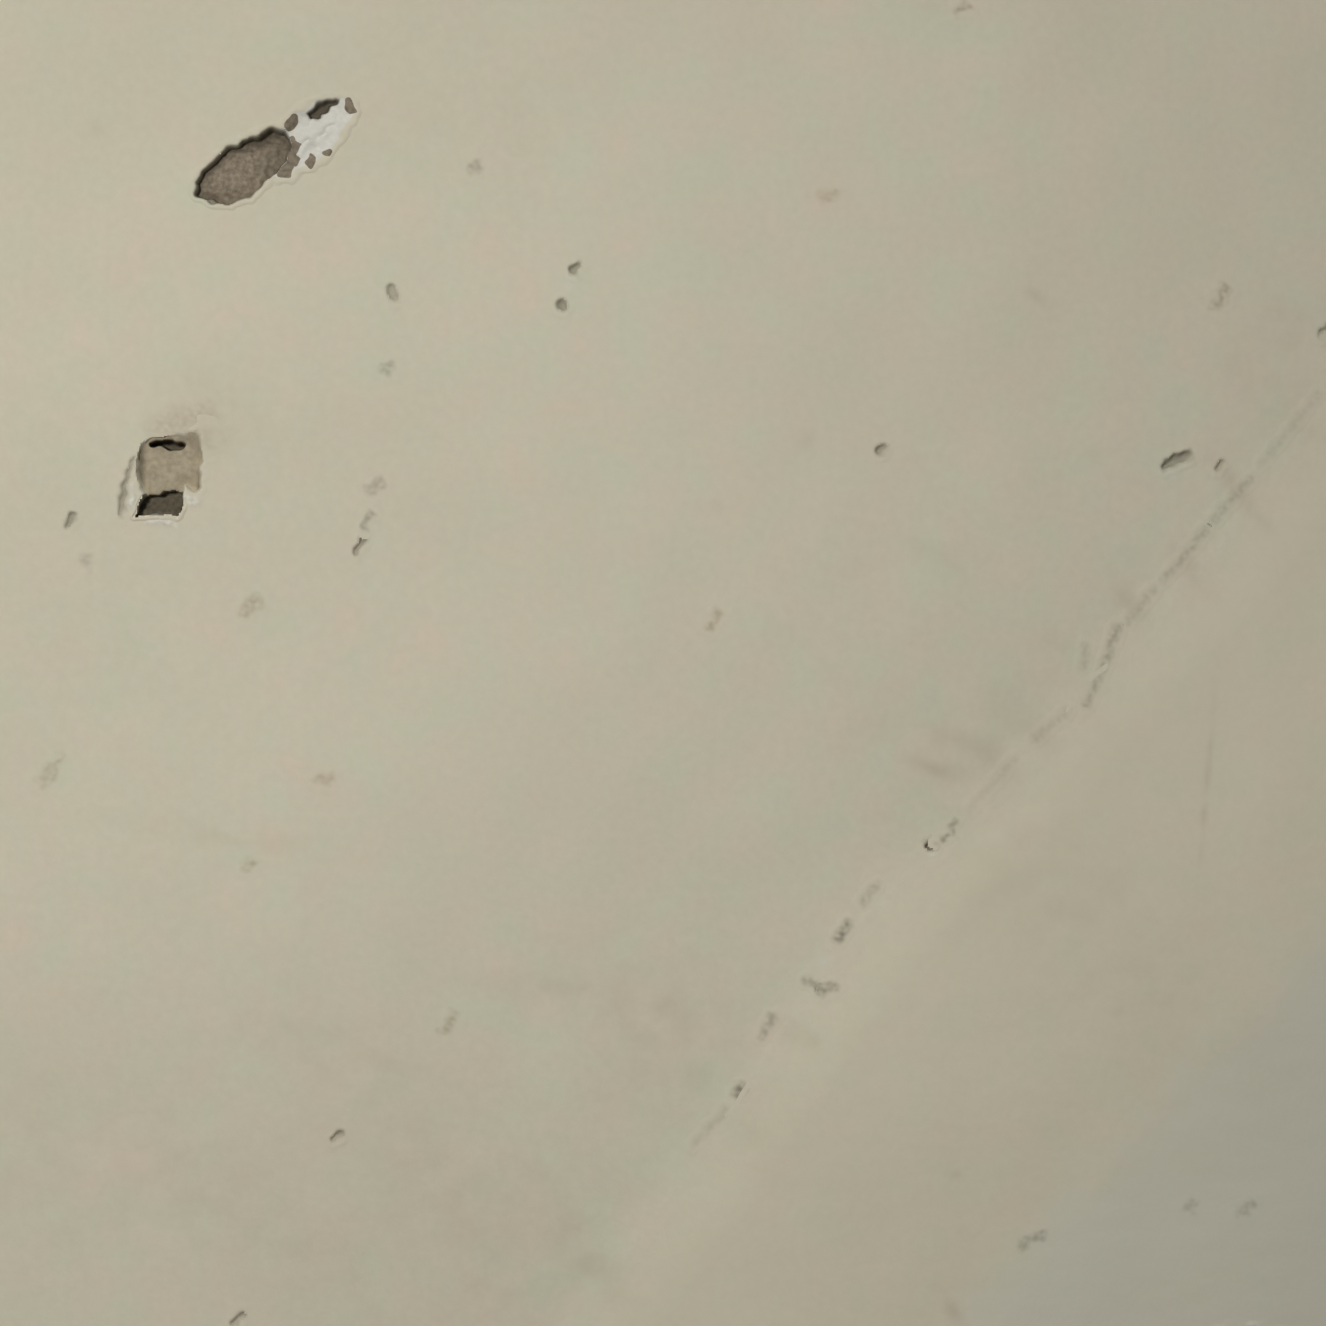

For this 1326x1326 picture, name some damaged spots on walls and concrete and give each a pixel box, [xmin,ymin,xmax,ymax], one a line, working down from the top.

flaking render [186,88,362,211]
flaking render [109,385,235,533]